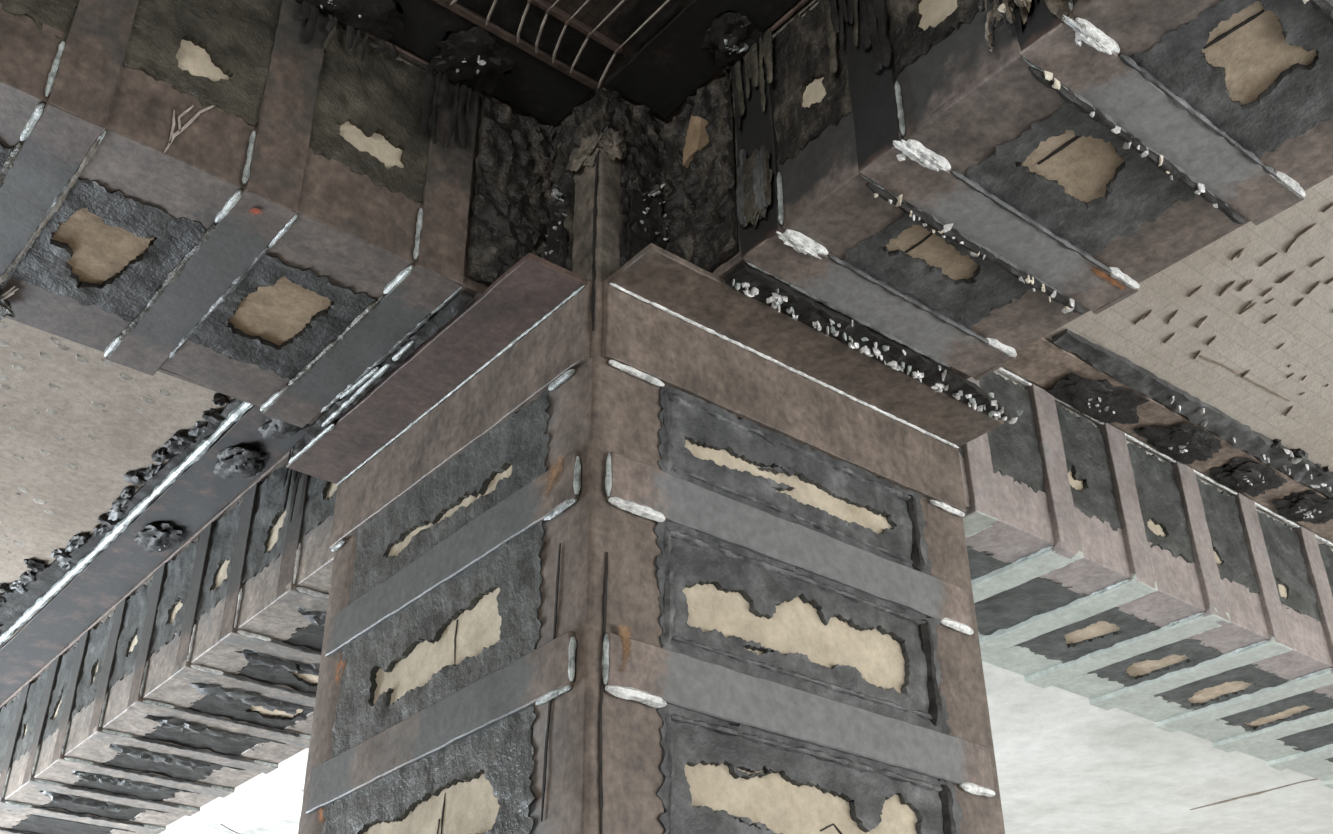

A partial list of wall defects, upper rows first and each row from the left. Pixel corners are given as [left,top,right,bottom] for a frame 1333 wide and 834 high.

peeling [1202,1,1317,105]
peeling [1022,126,1173,204]
peeling [229,276,331,346]
peeling [684,440,892,534]
peeling [373,587,502,705]
crack [553,543,561,639]
crack [599,552,608,834]
peeling [682,584,906,693]
crack [206,790,304,834]
peeling [363,774,500,834]
crack [541,700,552,822]
peeling [684,763,918,834]